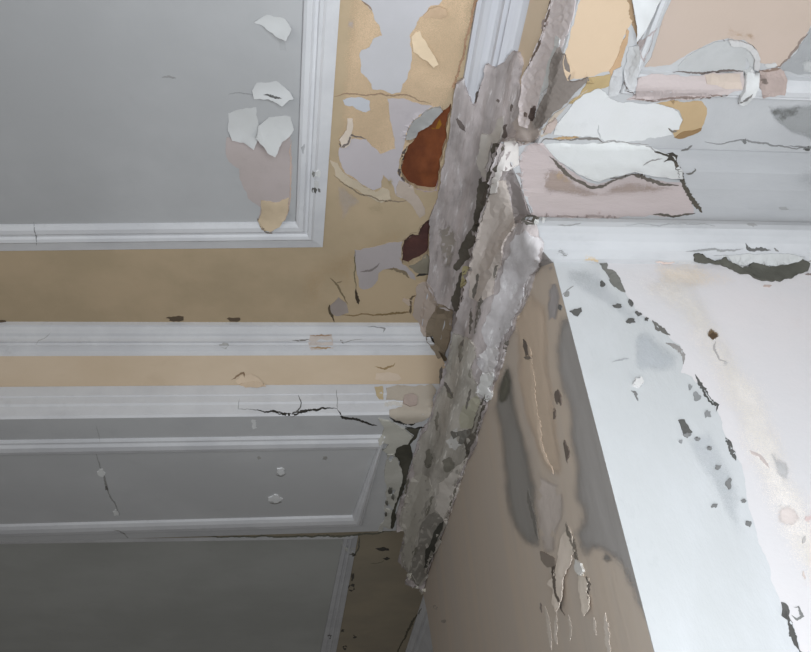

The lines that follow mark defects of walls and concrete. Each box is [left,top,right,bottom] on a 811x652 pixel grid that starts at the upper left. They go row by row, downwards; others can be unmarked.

peeling [254,15,292,51]
peeling [225,81,305,234]
spalling [328,0,811,652]
damp [600,263,686,364]
crack [238,389,424,429]
damp [633,243,811,594]
crack [96,427,128,538]